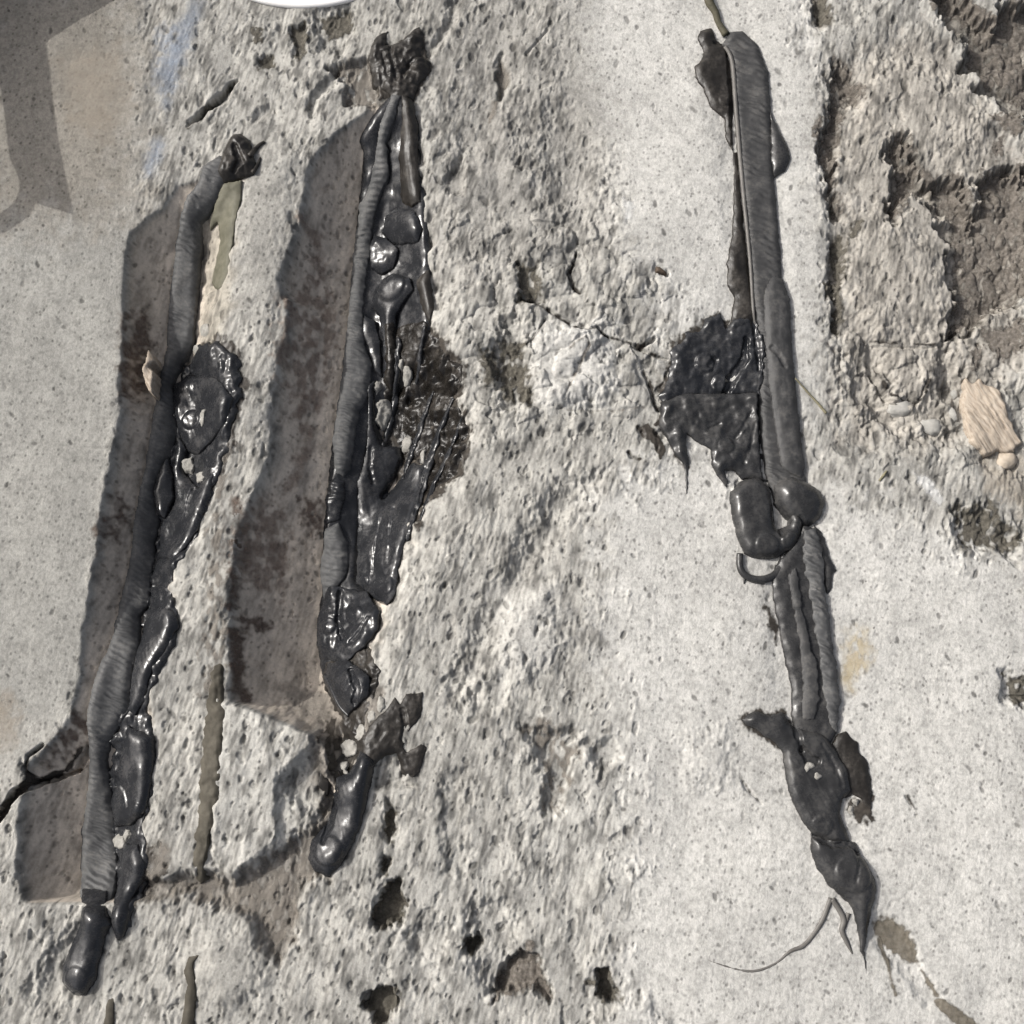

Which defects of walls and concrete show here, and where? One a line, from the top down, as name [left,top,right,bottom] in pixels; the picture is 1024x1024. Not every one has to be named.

spalling [812,0,835,27]
spalling [811,55,867,336]
spalling [886,0,1024,372]
crack [568,254,581,295]
crack [520,297,660,411]
spalling [948,499,1022,554]
crack [0,747,83,823]
spalling [371,858,410,930]
spalling [360,985,399,1024]
spalling [462,935,483,956]
spalling [488,940,553,1005]
spalling [584,967,624,1003]